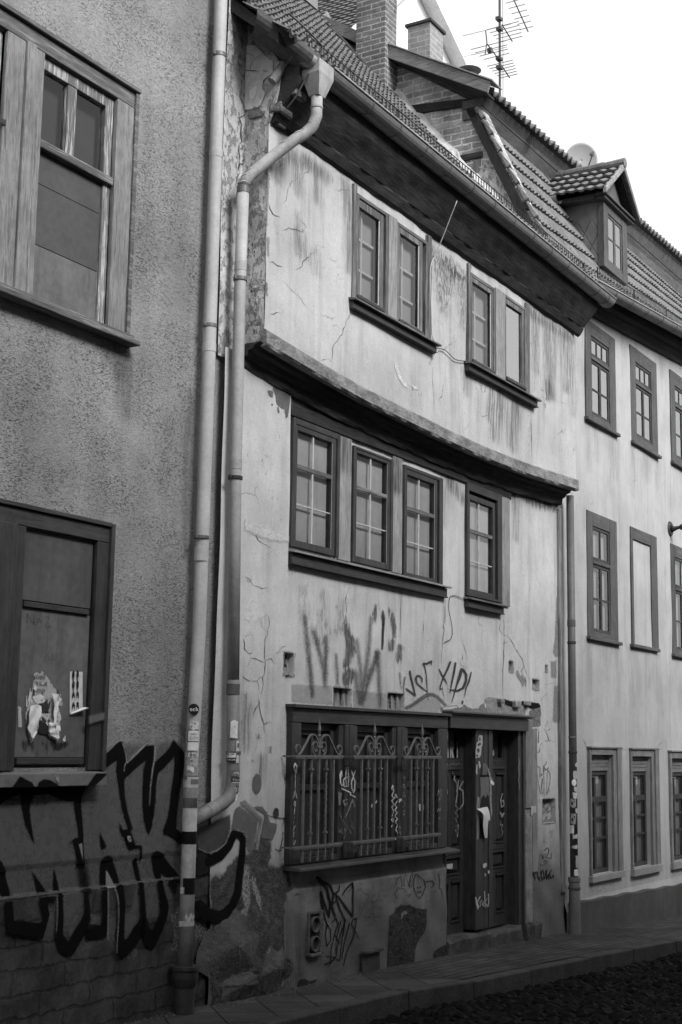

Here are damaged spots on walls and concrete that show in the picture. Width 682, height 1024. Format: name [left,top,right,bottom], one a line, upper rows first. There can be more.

spalling [248,84,264,120]
flaking render [268,386,290,418]
crack [243,621,284,732]
flaking render [209,836,318,1005]
spalling [387,904,427,967]